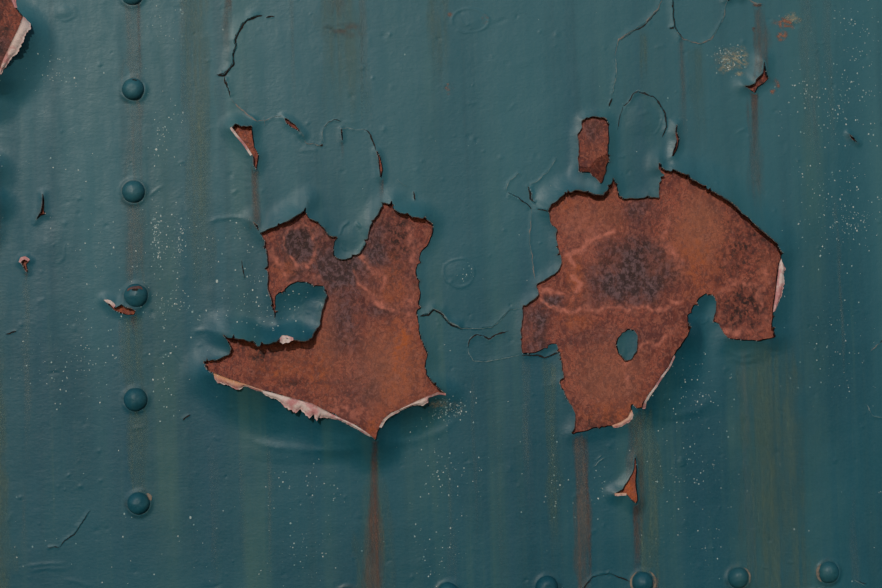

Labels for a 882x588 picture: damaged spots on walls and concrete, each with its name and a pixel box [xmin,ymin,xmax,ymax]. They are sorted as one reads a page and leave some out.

peeling [0,0,61,128]
crack [217,15,280,123]
crack [609,0,727,137]
peeling [730,46,777,101]
peeling [217,111,269,178]
crack [302,119,376,150]
peeling [0,149,54,252]
peeling [179,146,465,476]
peeling [513,107,801,448]
peeling [601,449,649,516]